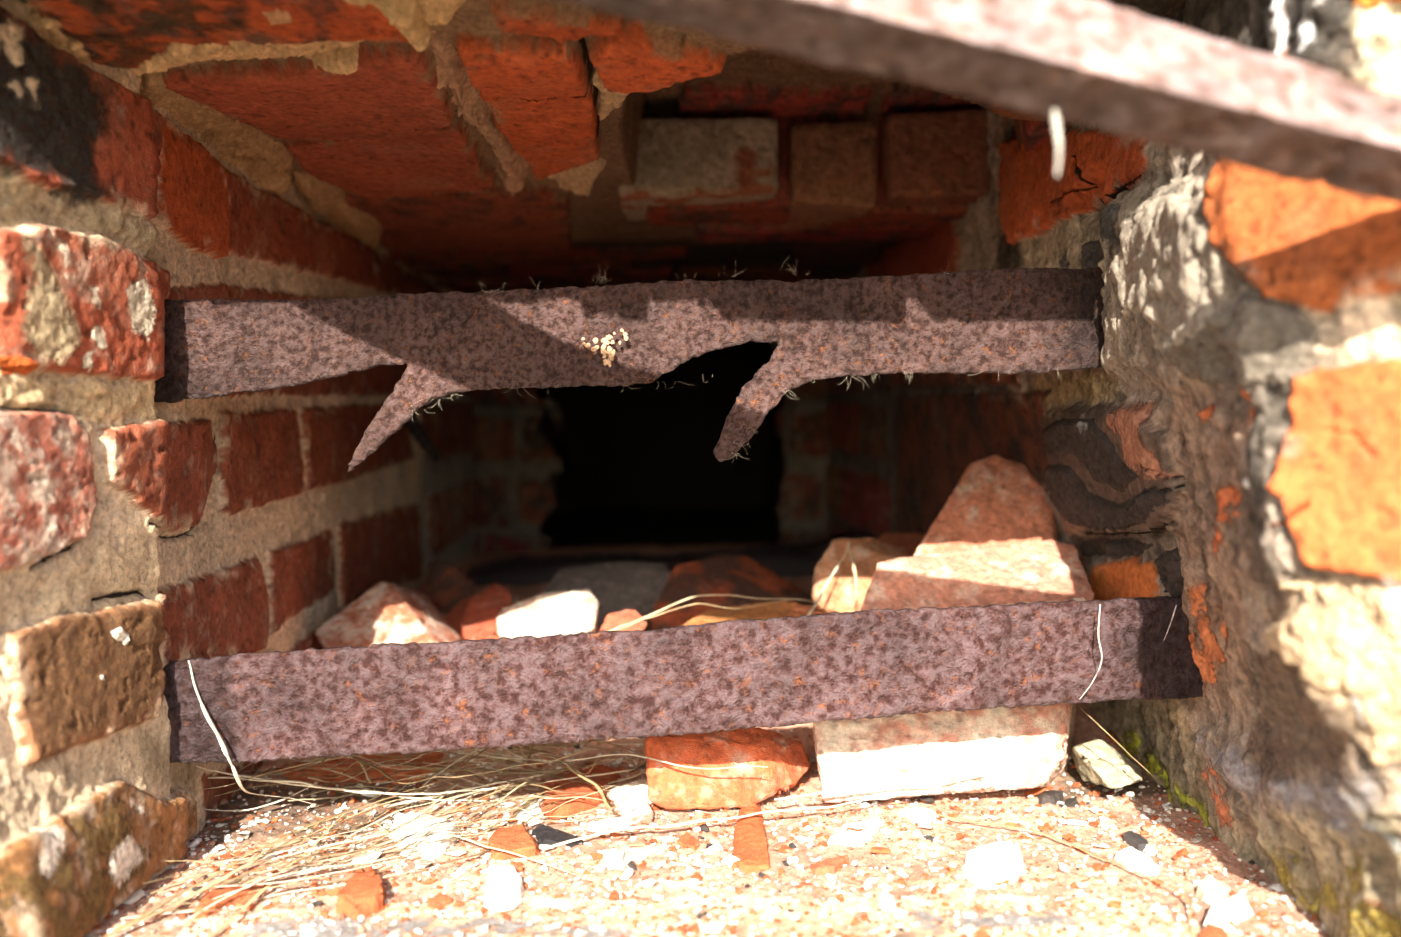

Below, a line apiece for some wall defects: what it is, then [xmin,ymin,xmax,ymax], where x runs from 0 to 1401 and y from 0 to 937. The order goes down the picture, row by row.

peeling [0,0,91,101]
leakage [1270,0,1289,53]